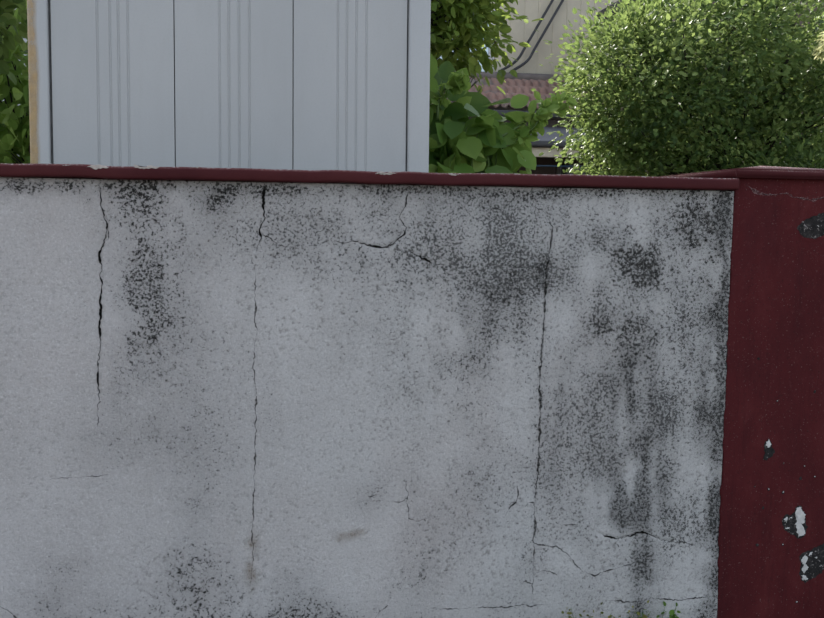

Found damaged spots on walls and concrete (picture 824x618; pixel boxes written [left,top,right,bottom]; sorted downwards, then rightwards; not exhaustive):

crack [256,186,291,247]
crack [322,190,444,273]
peeling [797,213,824,239]
crack [97,182,109,426]
crack [250,262,258,579]
damp [0,178,733,618]
crack [435,205,686,610]
peeling [763,440,775,460]
peeling [782,505,808,539]
peeling [799,543,824,583]
crack [612,596,704,604]